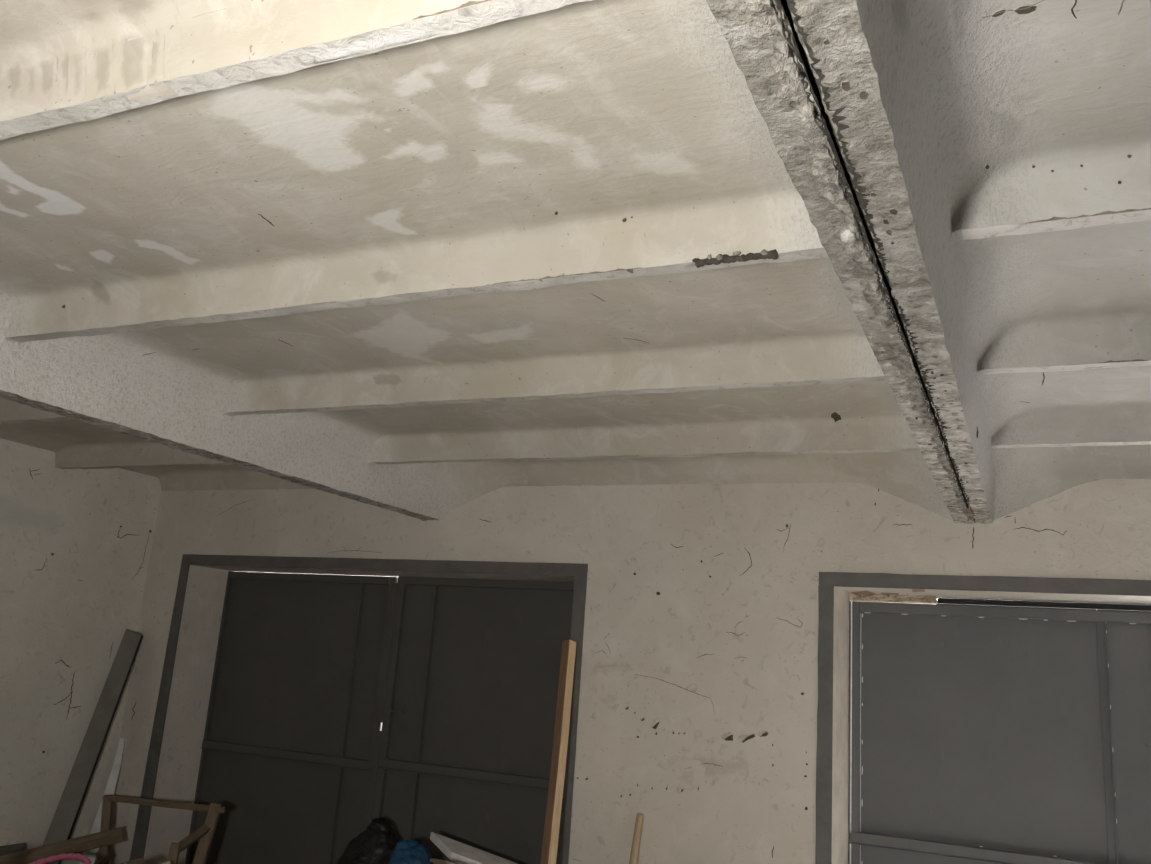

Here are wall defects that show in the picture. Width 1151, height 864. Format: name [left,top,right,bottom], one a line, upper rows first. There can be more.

spalling [991,4,1039,17]
spalling [692,249,778,268]
spalling [495,267,642,284]
crack [744,0,978,548]
crack [1004,515,1066,535]
crack [594,633,714,708]
crack [54,660,81,720]
spalling [721,730,773,746]